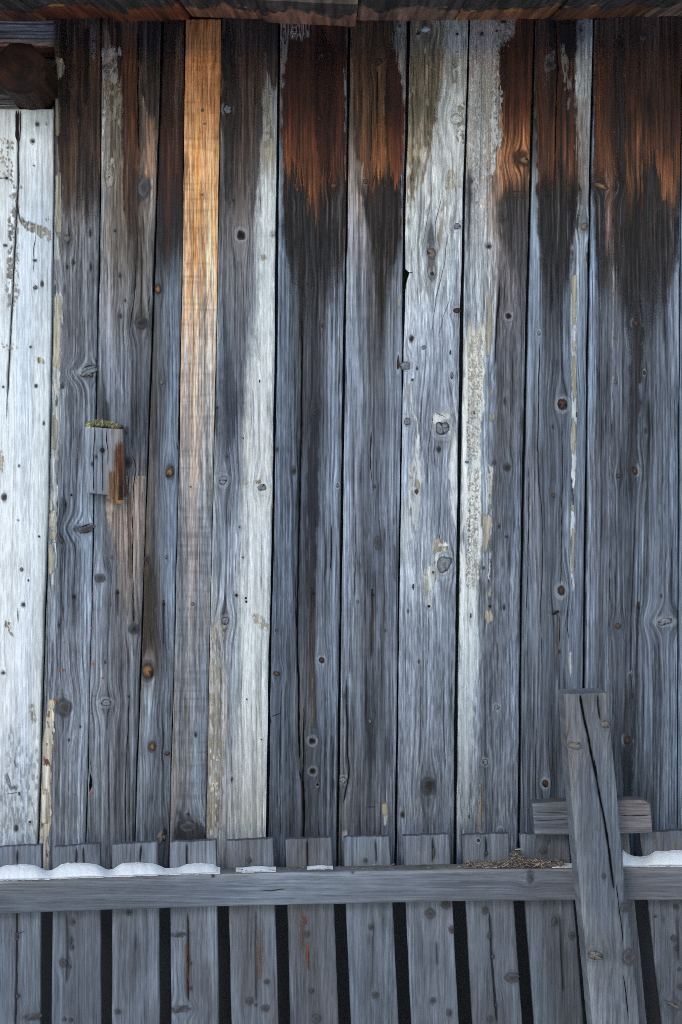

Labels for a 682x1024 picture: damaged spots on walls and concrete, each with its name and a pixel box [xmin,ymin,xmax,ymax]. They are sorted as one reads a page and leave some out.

peeling [0,138,63,605]
peeling [56,58,65,79]
damp [222,18,444,332]
damp [498,17,581,305]
damp [593,14,682,499]
peeling [422,295,495,833]
peeling [0,700,56,870]
crack [580,694,649,940]